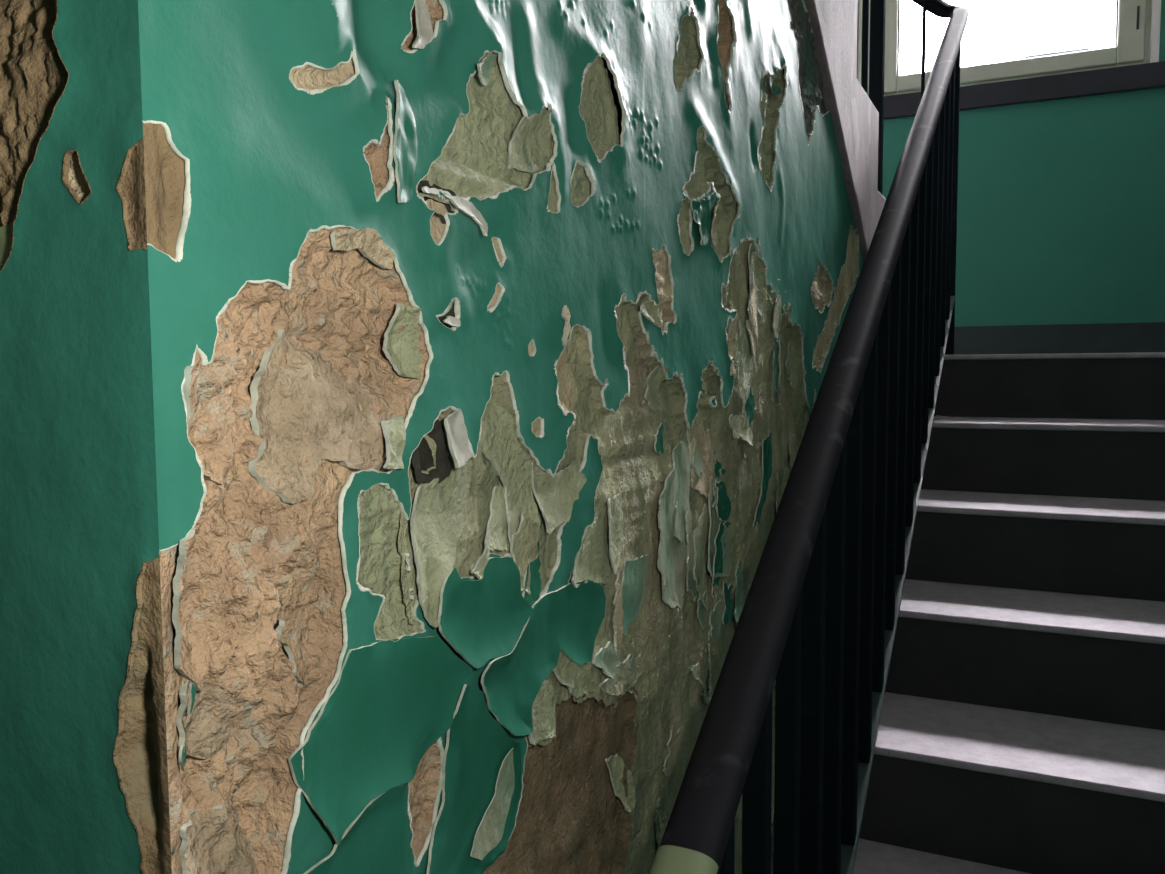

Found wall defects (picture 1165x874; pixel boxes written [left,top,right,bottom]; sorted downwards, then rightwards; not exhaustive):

spalling [0,0,69,272]
peeling [401,0,448,53]
peeling [363,50,625,246]
peeling [673,0,737,116]
peeling [757,64,787,192]
spalling [113,120,817,874]